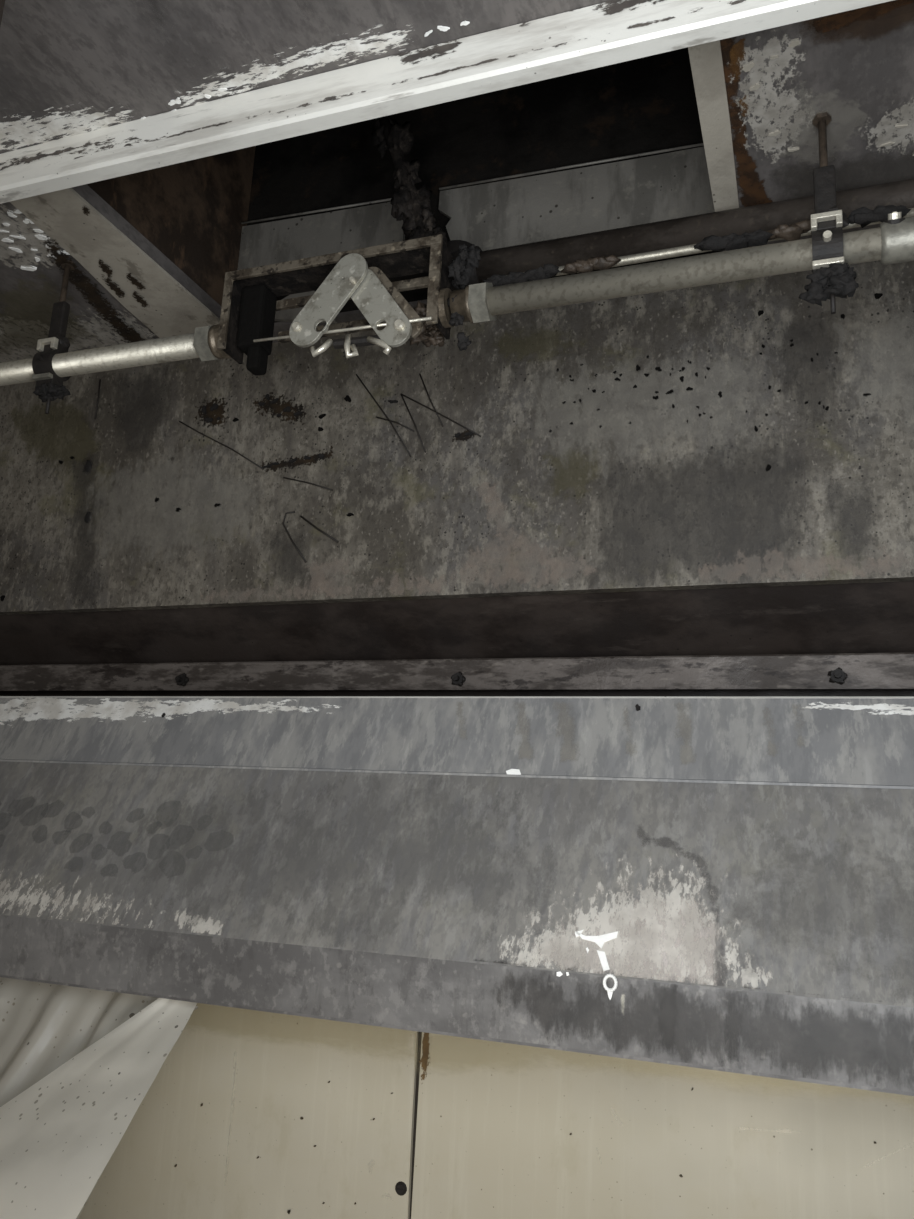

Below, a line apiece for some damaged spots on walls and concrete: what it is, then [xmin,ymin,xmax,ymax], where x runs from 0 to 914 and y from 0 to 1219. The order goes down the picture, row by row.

peeling [424,21,470,37]
corrosion [720,37,772,207]
peeling [728,30,818,166]
peeling [858,94,914,156]
peeling [500,854,773,989]
corrosion [419,1032,430,1080]